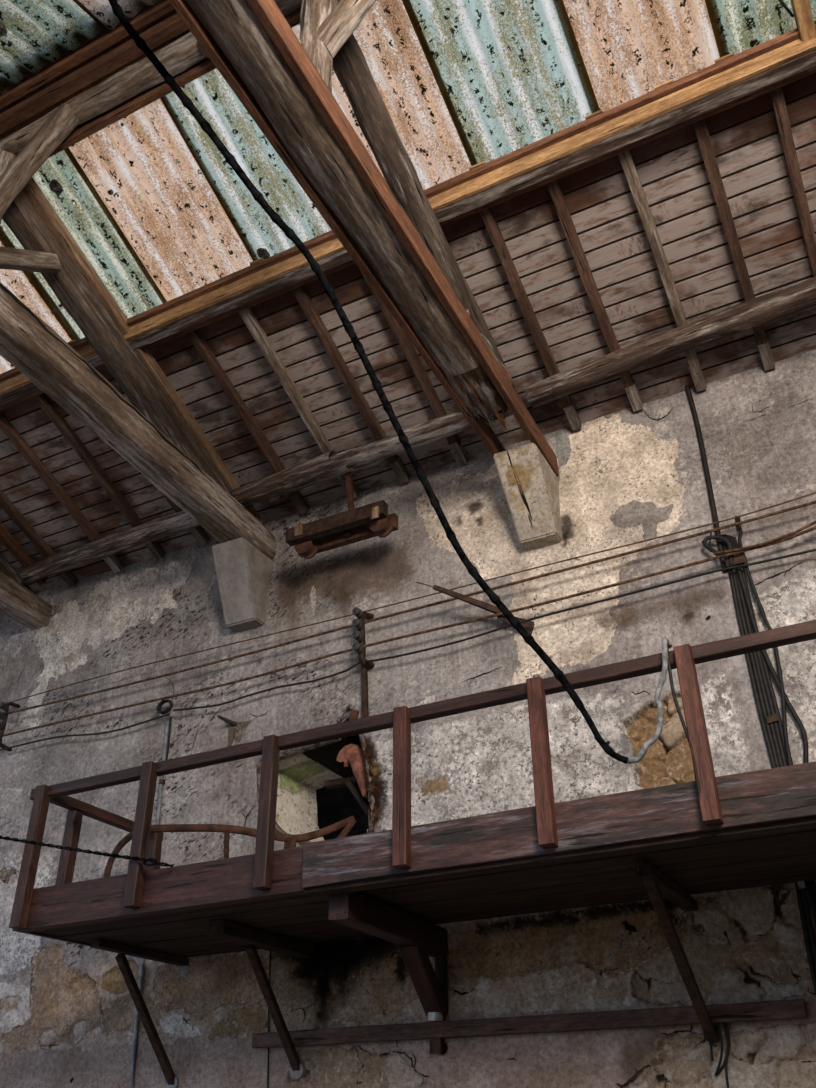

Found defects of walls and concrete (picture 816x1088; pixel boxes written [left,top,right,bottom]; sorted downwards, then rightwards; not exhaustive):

crack [507,450,532,526]
flaking render [415,413,686,685]
flaking render [18,561,192,728]
peeling [411,704,535,826]
peeling [546,690,696,803]
peeling [699,668,751,777]
flaking render [0,851,419,1053]
leakage [299,960,350,1023]
spalling [447,885,808,1006]
spalling [287,1046,424,1088]
spalling [627,1022,816,1088]